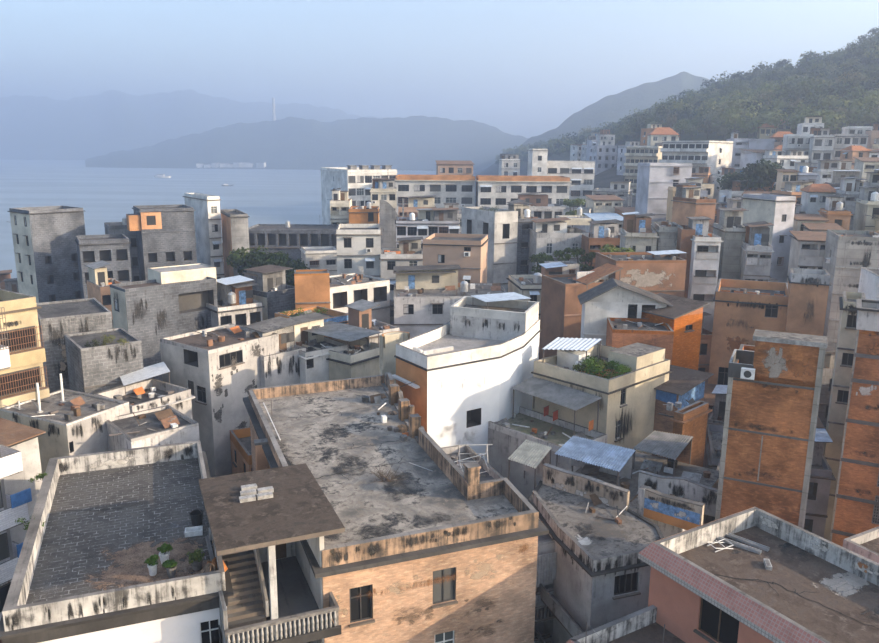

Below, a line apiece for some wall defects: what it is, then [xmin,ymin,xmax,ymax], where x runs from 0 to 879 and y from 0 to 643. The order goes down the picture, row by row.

damp [108,345,136,363]
damp [265,354,300,377]
damp [162,447,193,460]
damp [565,476,623,500]
damp [406,527,467,547]
damp [330,543,381,563]